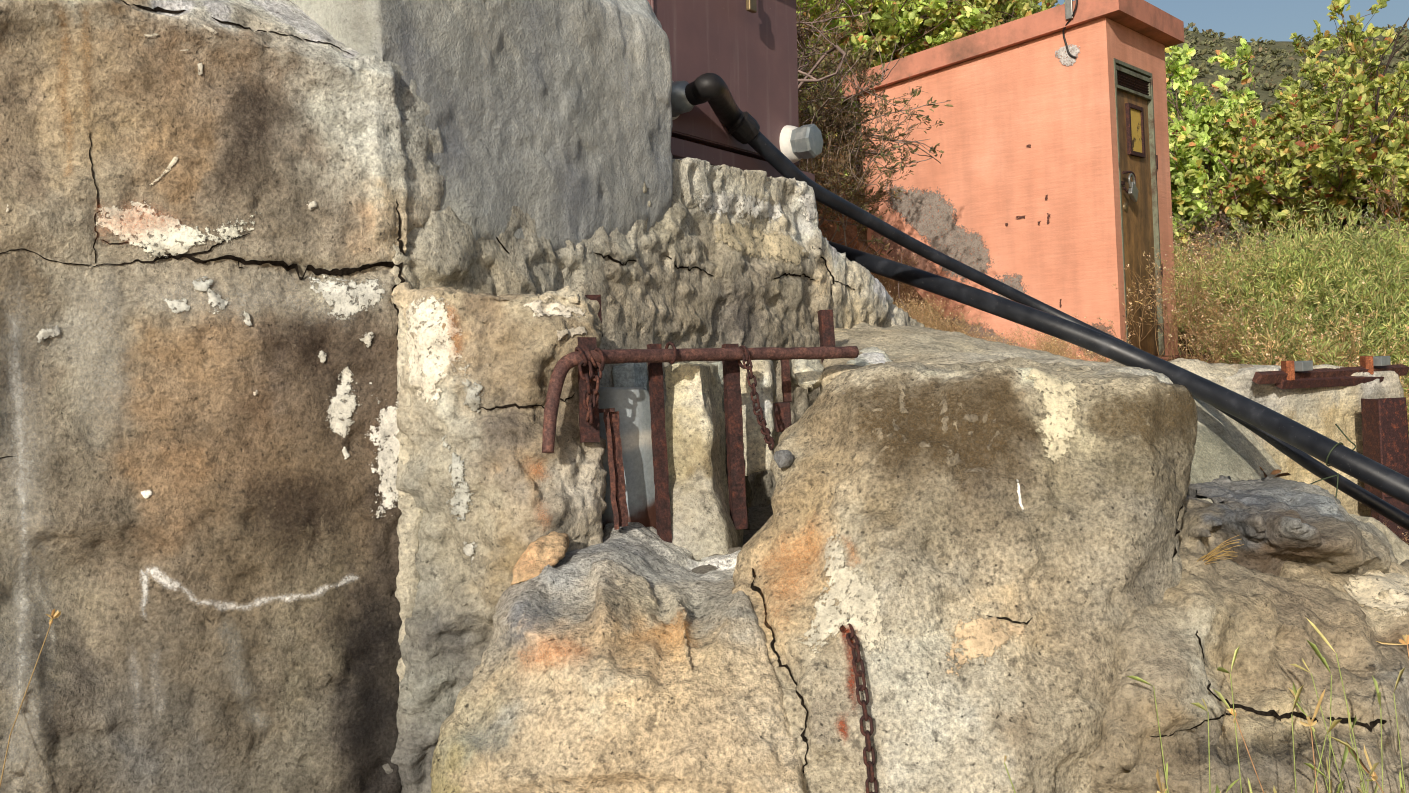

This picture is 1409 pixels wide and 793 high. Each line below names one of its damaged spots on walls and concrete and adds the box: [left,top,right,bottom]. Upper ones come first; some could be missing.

crack [120,0,352,55]
peeling [96,201,257,260]
crack [0,133,405,350]
peeling [870,181,1029,300]
peeling [950,314,1027,348]
peeling [325,295,483,522]
peeling [463,541,477,566]
crack [750,568,809,773]
crack [1151,631,1387,737]